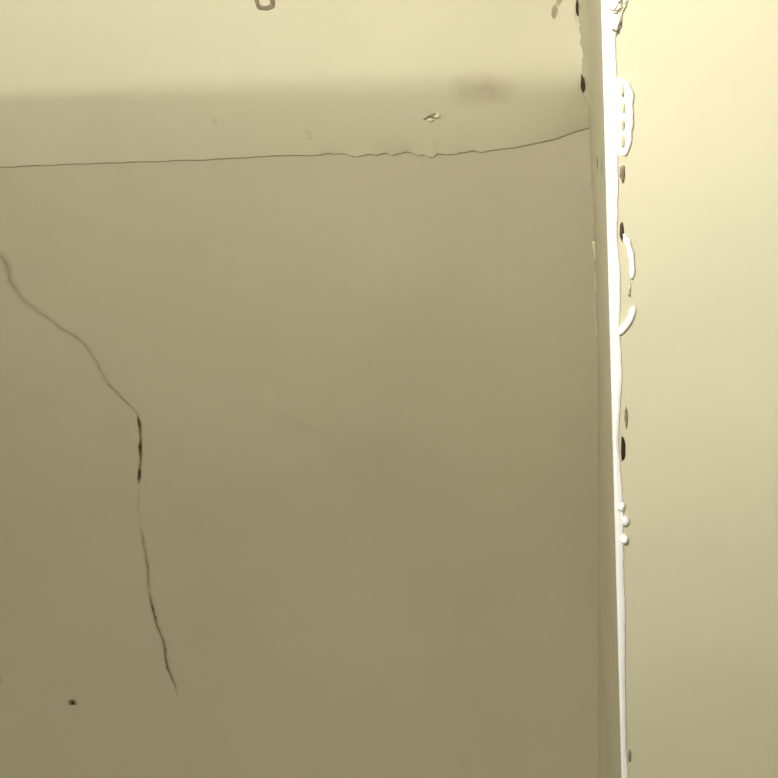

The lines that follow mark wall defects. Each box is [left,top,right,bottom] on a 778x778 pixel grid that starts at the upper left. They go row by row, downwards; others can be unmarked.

crack [135,419,143,480]